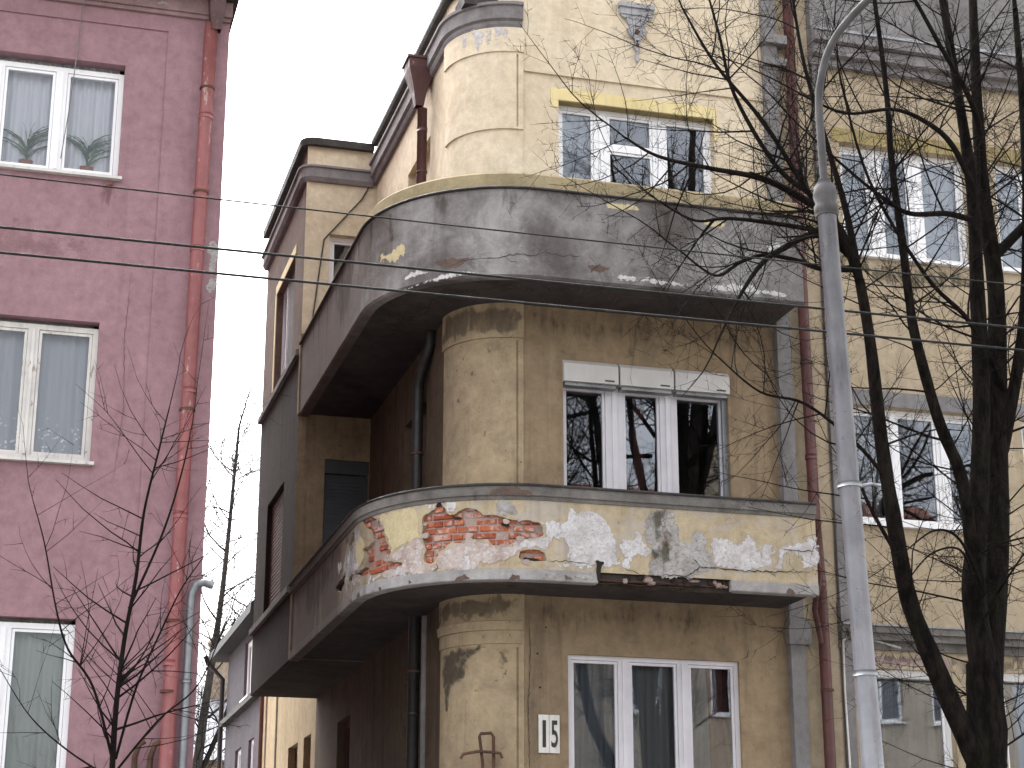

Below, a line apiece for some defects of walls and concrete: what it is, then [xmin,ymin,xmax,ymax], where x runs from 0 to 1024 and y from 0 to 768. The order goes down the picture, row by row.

peeling [462,27,508,51]
spalling [405,257,469,280]
spalling [338,499,820,599]
damp [443,646,480,711]